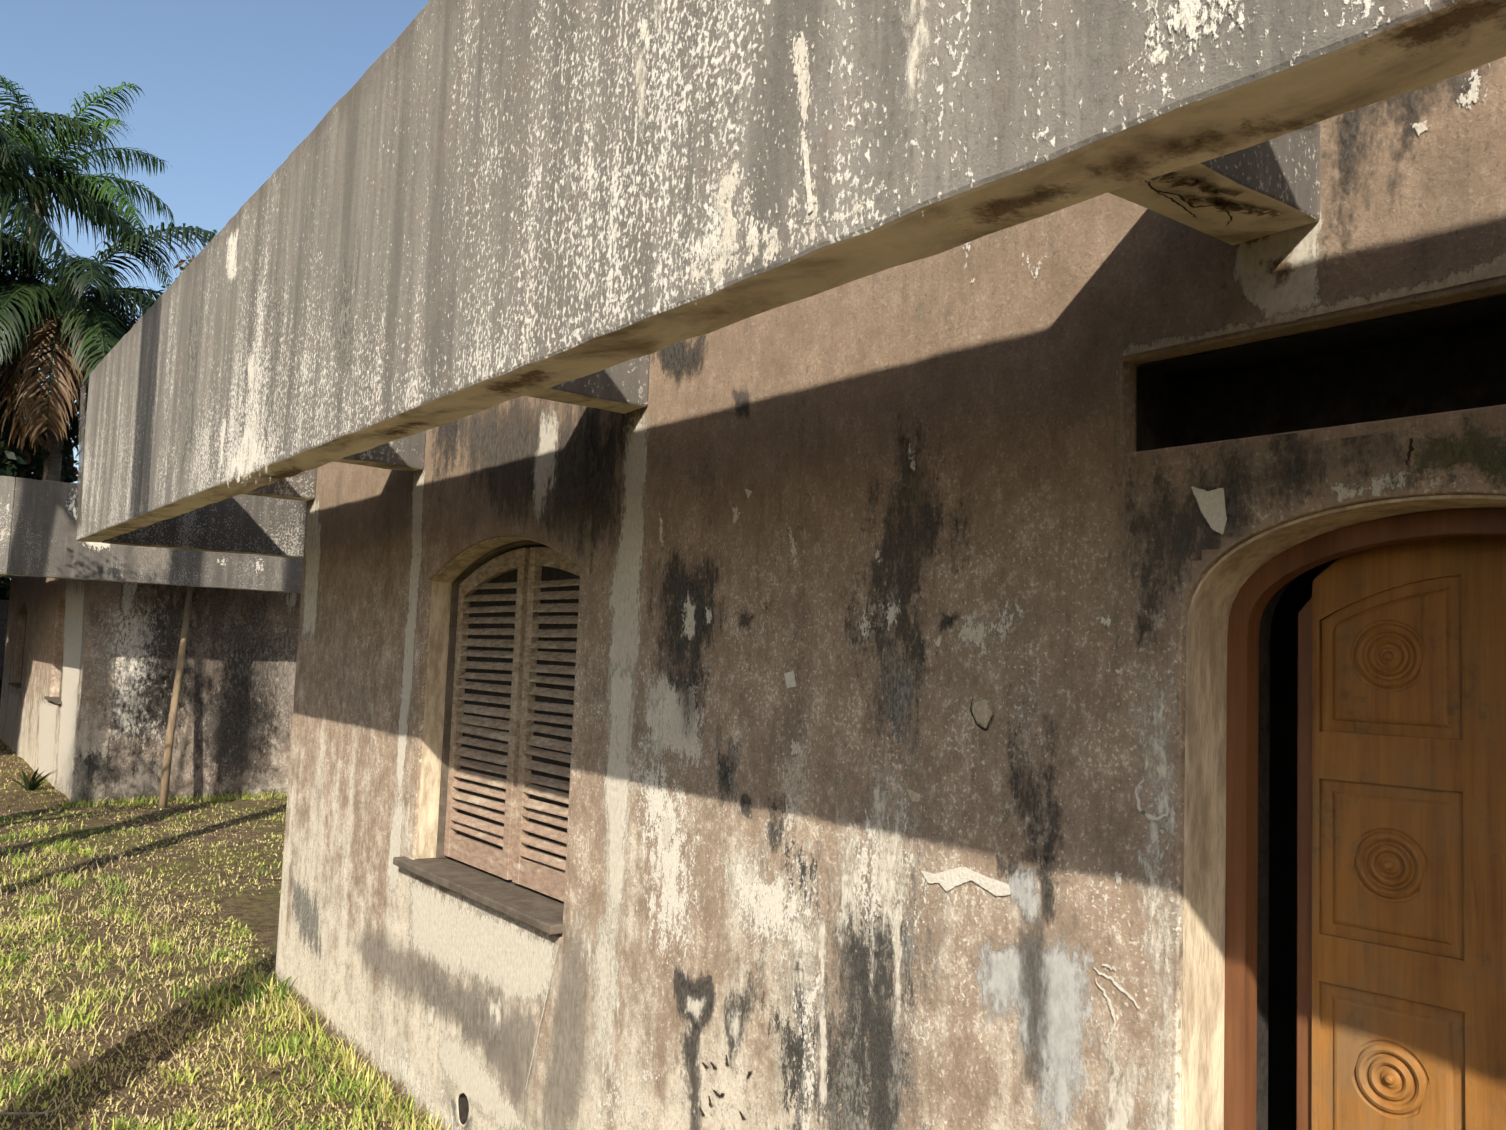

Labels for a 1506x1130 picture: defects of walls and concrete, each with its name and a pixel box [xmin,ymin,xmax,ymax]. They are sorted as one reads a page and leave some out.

damp [1382,0,1506,47]
damp [976,187,1068,223]
damp [271,467,306,483]
peeling [1125,417,1506,645]
damp [38,500,321,805]
damp [269,970,457,1130]
damp [358,371,967,1130]
peeling [784,671,796,688]
peeling [921,866,1093,1130]
damp [997,722,1063,923]
damp [1104,678,1176,1130]